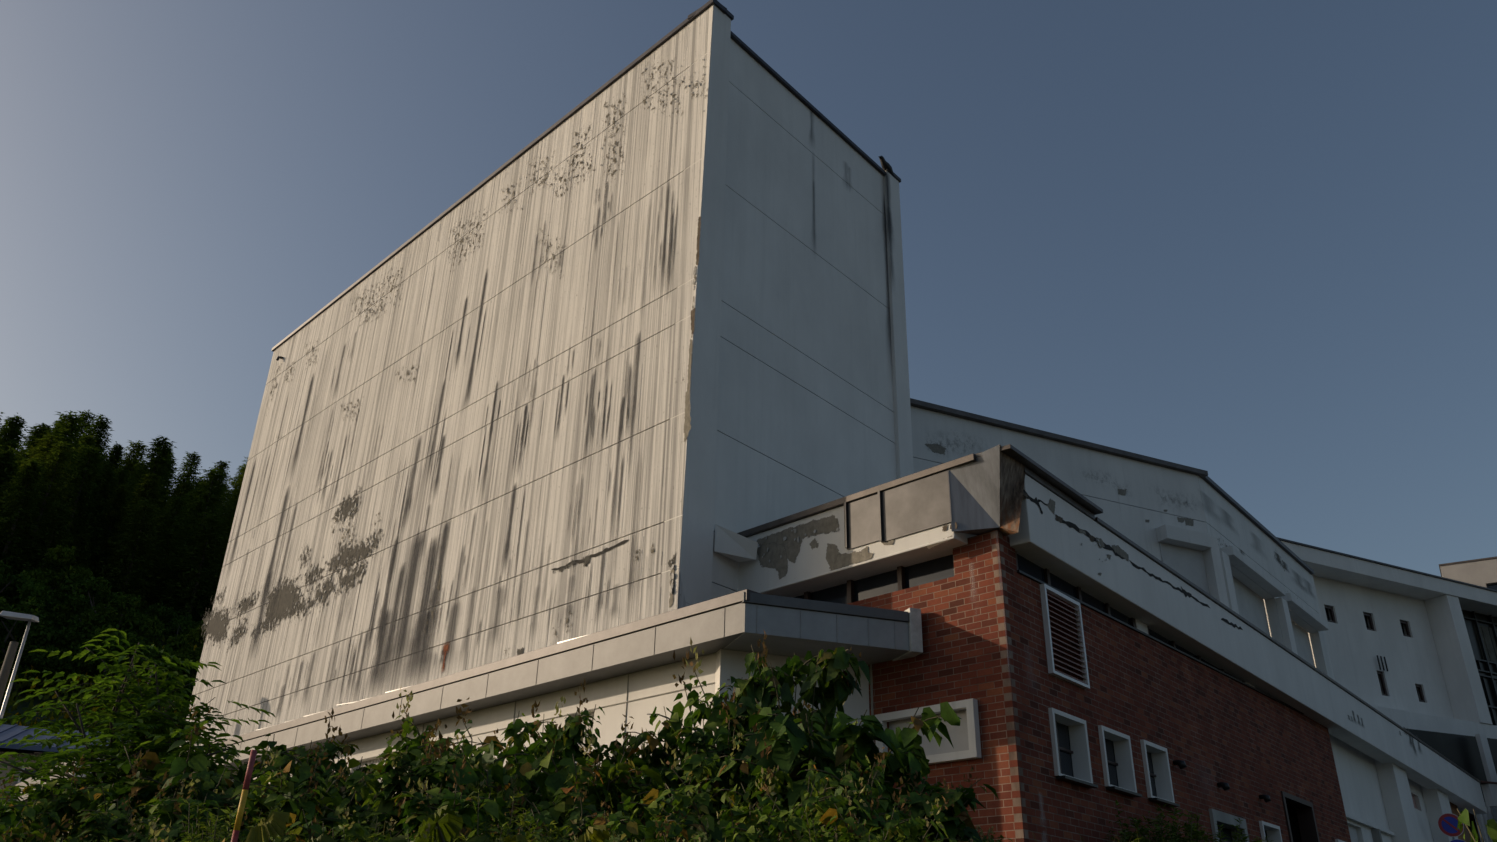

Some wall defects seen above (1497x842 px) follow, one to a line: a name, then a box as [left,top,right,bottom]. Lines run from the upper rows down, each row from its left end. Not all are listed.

damp [650,188,677,277]
damp [554,153,642,578]
damp [225,178,572,706]
damp [568,481,609,613]
crack [551,540,654,574]
peeling [757,515,894,580]
crack [1021,489,1243,630]